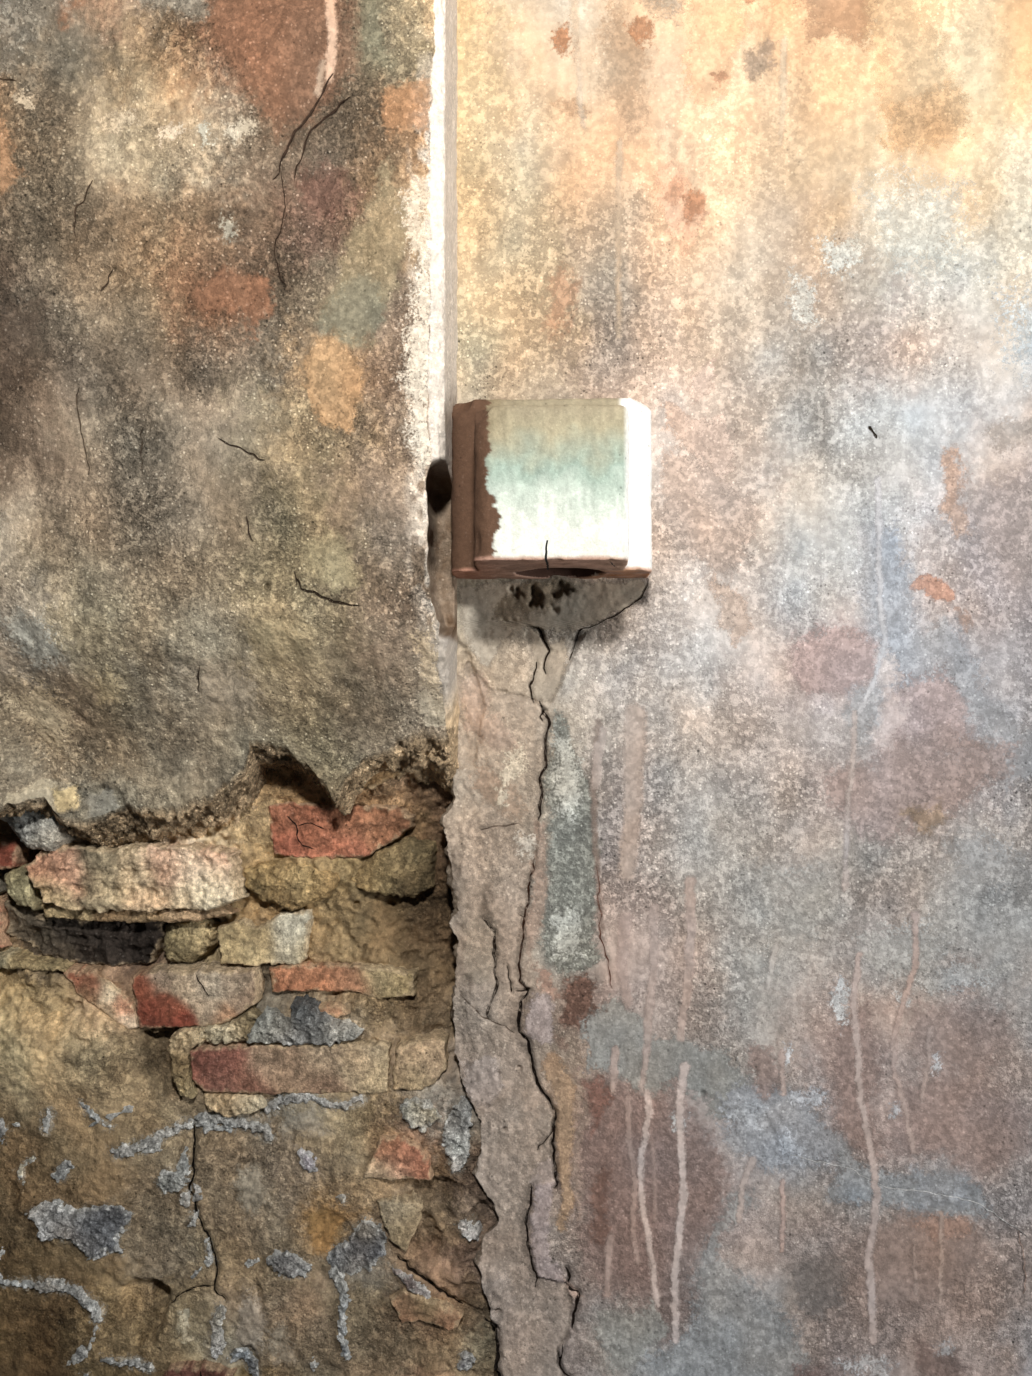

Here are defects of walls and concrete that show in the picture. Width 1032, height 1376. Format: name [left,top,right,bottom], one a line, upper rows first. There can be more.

water stain [643,0,749,106]
crack [273,73,350,291]
water stain [653,160,707,257]
water stain [783,0,978,328]
water stain [941,448,969,538]
crack [481,583,649,830]
spalling [0,577,646,1376]
crack [597,870,612,987]
water stain [853,921,1029,1007]
crack [171,1124,226,1303]
crack [461,858,580,1376]
water stain [580,878,992,1376]